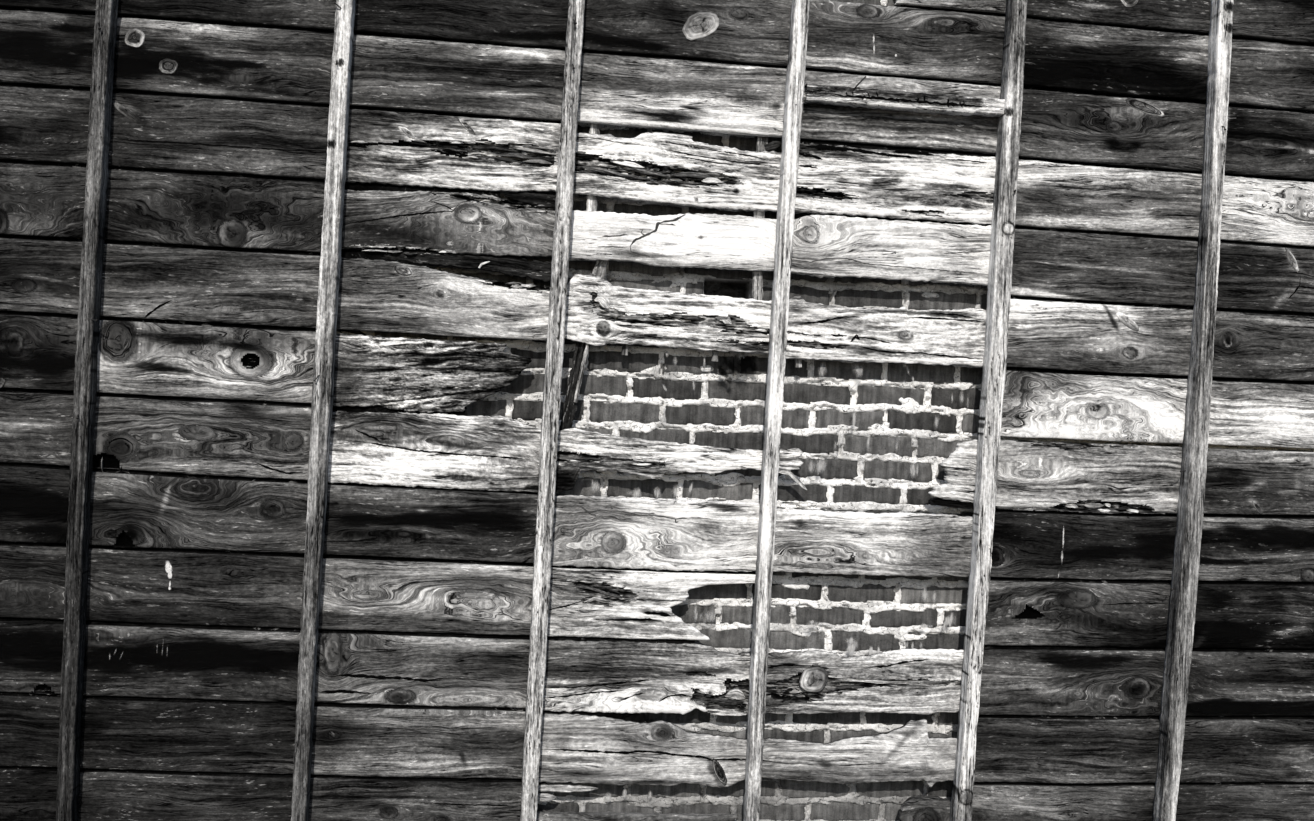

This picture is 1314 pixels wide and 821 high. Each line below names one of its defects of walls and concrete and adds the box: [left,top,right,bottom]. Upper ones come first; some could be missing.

crack [599,214,686,257]